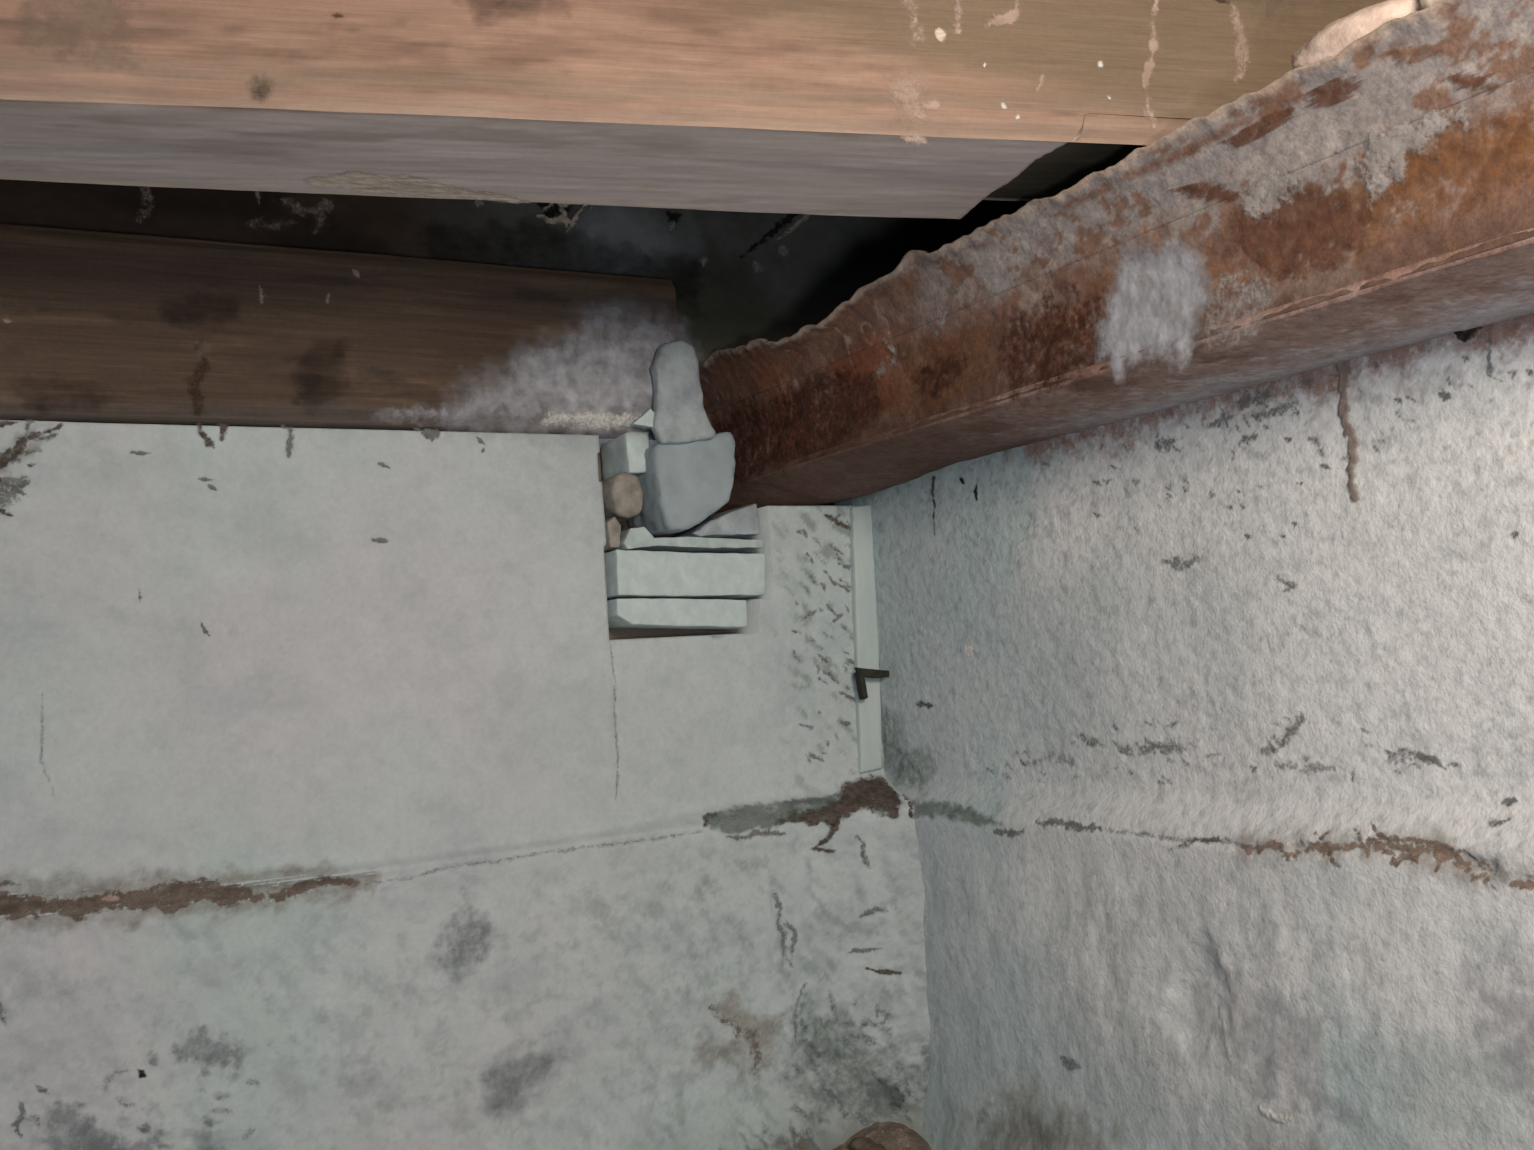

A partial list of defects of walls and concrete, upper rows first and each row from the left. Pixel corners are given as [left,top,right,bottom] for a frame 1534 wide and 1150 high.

corrosion [1221,76,1361,147]
corrosion [1385,42,1442,63]
corrosion [1449,73,1499,95]
corrosion [1168,107,1534,280]
crack [0,420,63,516]
corrosion [713,371,880,482]
corrosion [1000,285,1106,401]
corrosion [1027,313,1534,459]
crack [0,870,375,921]
crack [994,818,1534,890]